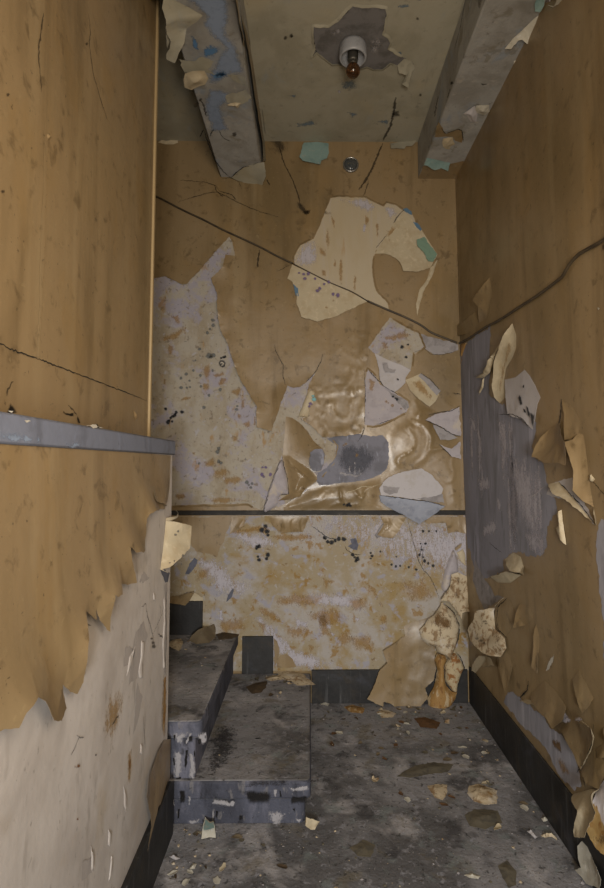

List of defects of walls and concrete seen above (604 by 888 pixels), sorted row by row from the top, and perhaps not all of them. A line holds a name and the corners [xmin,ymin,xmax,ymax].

flaking render [310,3,415,88]
peeling [505,0,562,49]
peeling [464,105,490,122]
peeling [424,158,450,171]
water stain [238,525,273,561]
peeling [0,190,604,888]
water stain [303,515,466,575]
water stain [259,619,331,669]